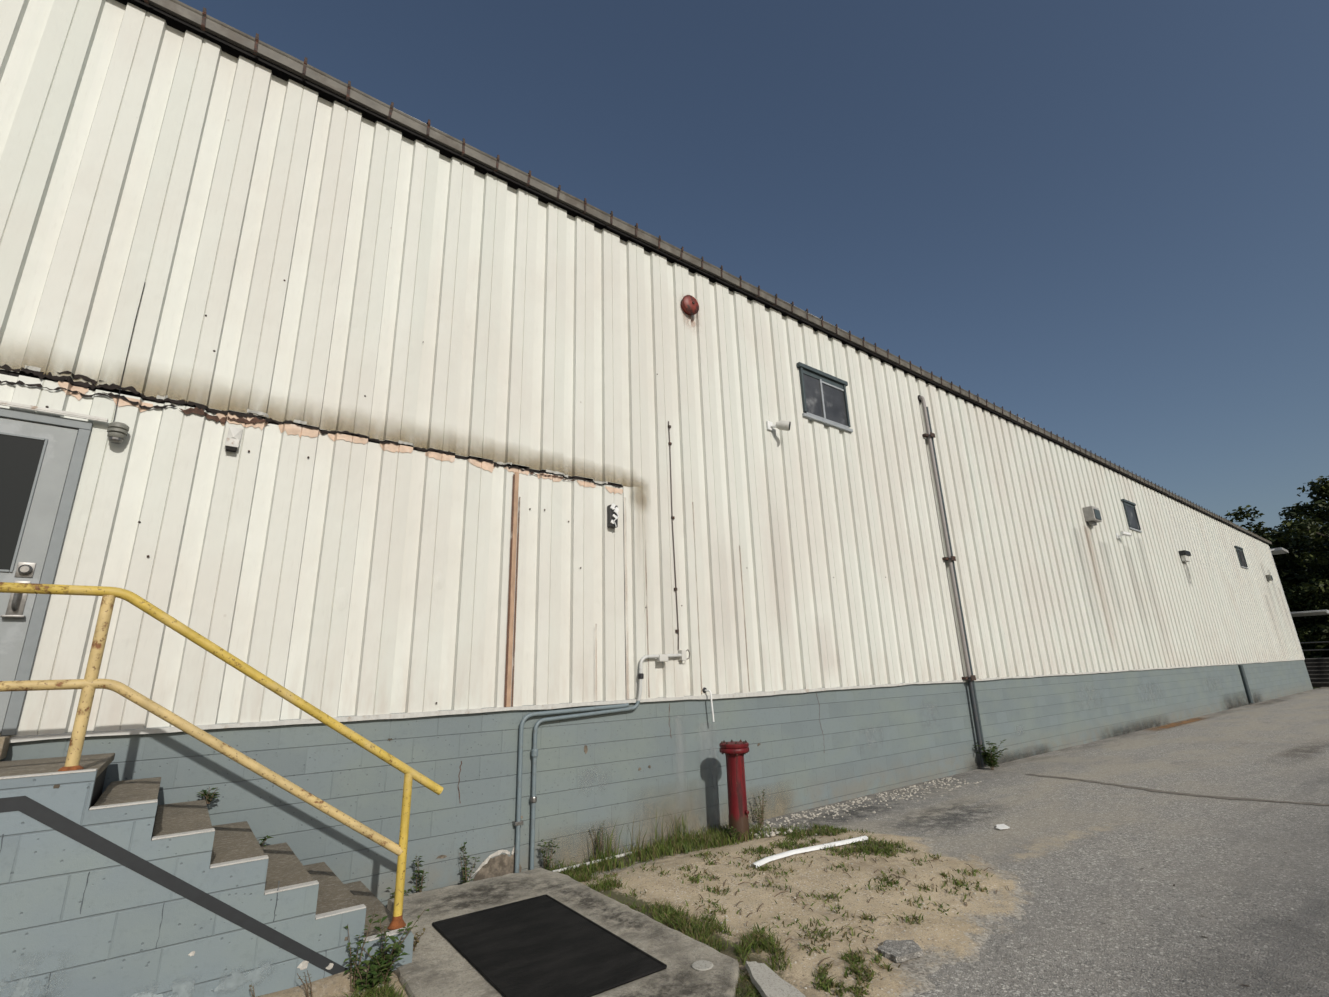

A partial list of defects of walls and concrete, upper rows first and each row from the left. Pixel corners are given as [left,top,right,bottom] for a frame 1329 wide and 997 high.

peeling [0,365,623,494]